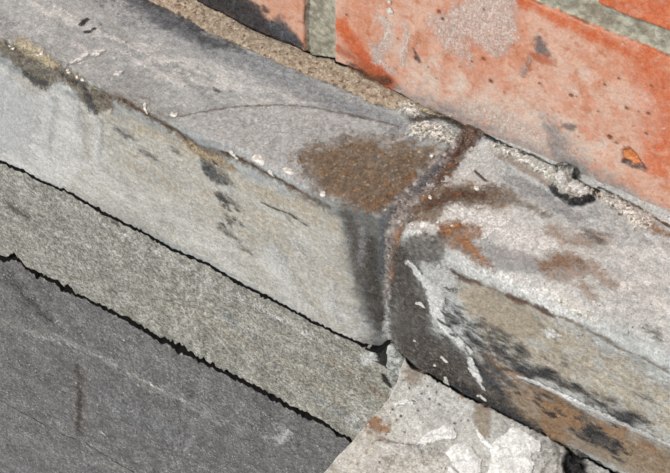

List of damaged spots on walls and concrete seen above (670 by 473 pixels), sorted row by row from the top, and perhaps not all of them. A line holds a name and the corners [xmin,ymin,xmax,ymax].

rust [290,132,434,215]
rust [437,219,493,271]
water stain [339,209,621,453]